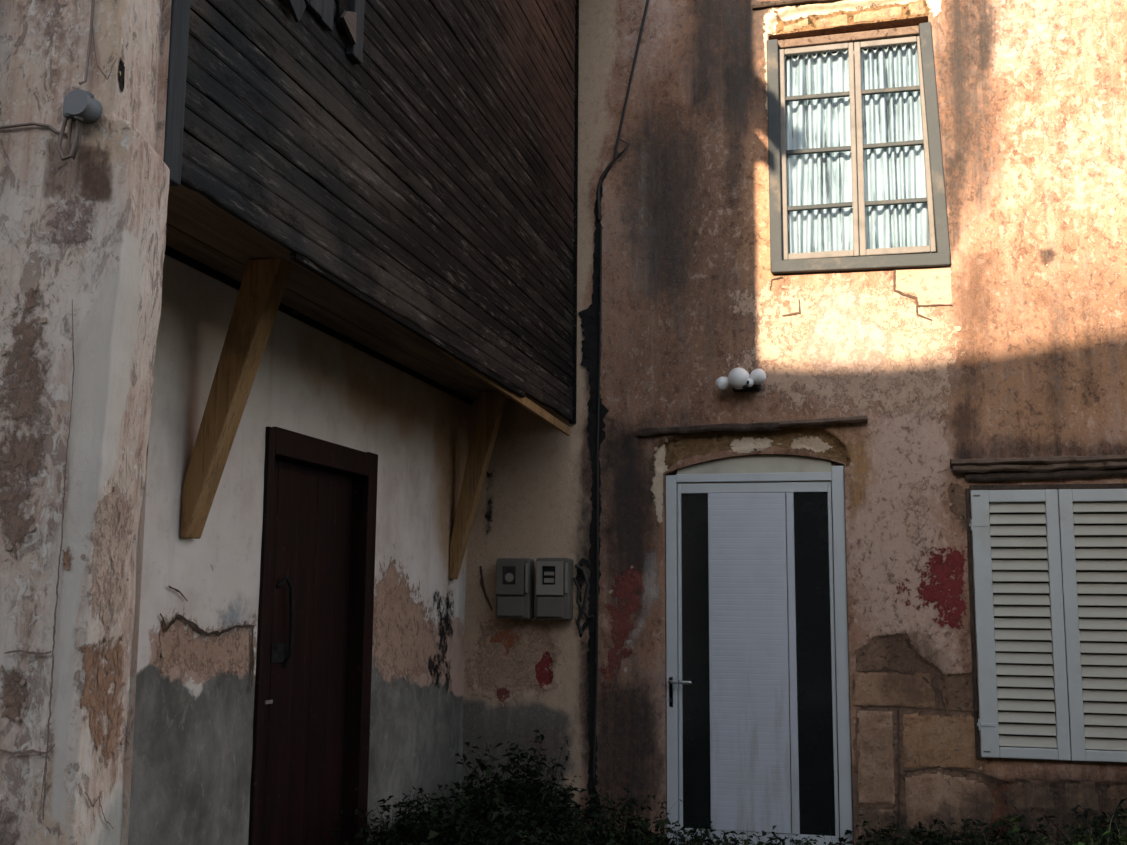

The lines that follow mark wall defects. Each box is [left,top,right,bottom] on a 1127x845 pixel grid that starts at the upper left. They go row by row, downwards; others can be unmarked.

damp [698,0,769,185]
flaking render [763,0,943,120]
damp [948,0,995,123]
crack [893,270,953,321]
flaking render [0,284,50,559]
flaking render [649,270,967,523]
flaking render [61,482,133,768]
flaking render [153,611,257,687]
flaking render [373,544,446,690]
peeling [535,651,553,688]
peeling [886,546,969,632]
flaking render [852,630,1127,845]